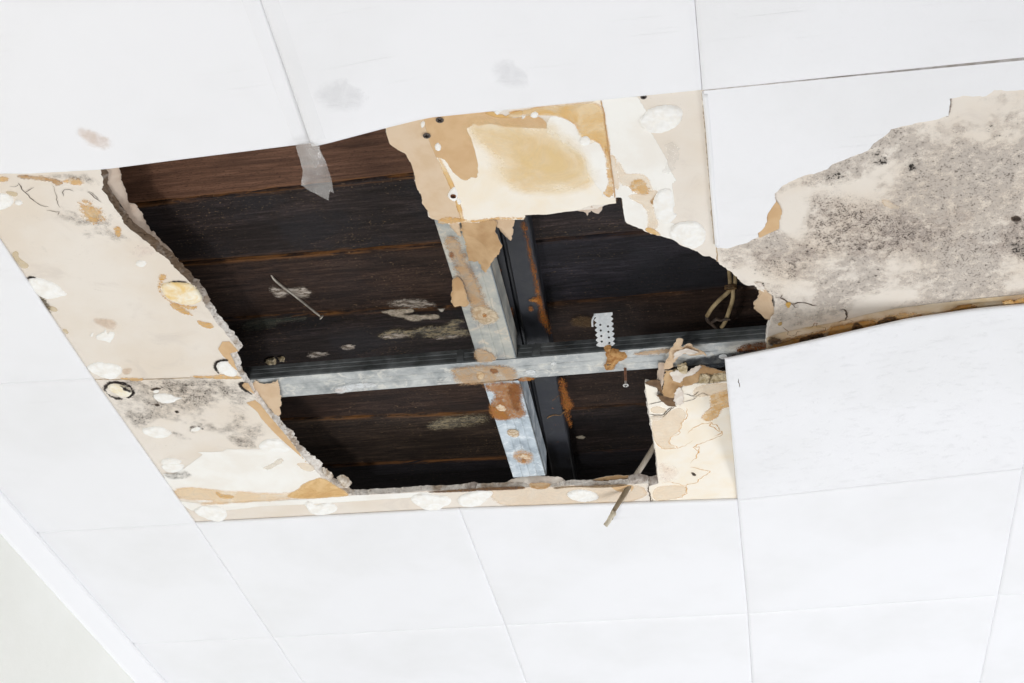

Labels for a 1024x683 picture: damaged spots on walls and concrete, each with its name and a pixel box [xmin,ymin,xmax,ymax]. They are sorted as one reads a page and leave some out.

damp [0,175,90,196]
damp [68,200,121,237]
damp [438,169,522,224]
peeling [437,97,676,238]
damp [475,105,658,235]
damp [724,116,1024,348]
damp [158,274,213,329]
rust [521,222,552,334]
damp [102,359,261,447]
peeling [163,448,525,511]
rust [547,378,573,426]
peeling [554,381,736,501]